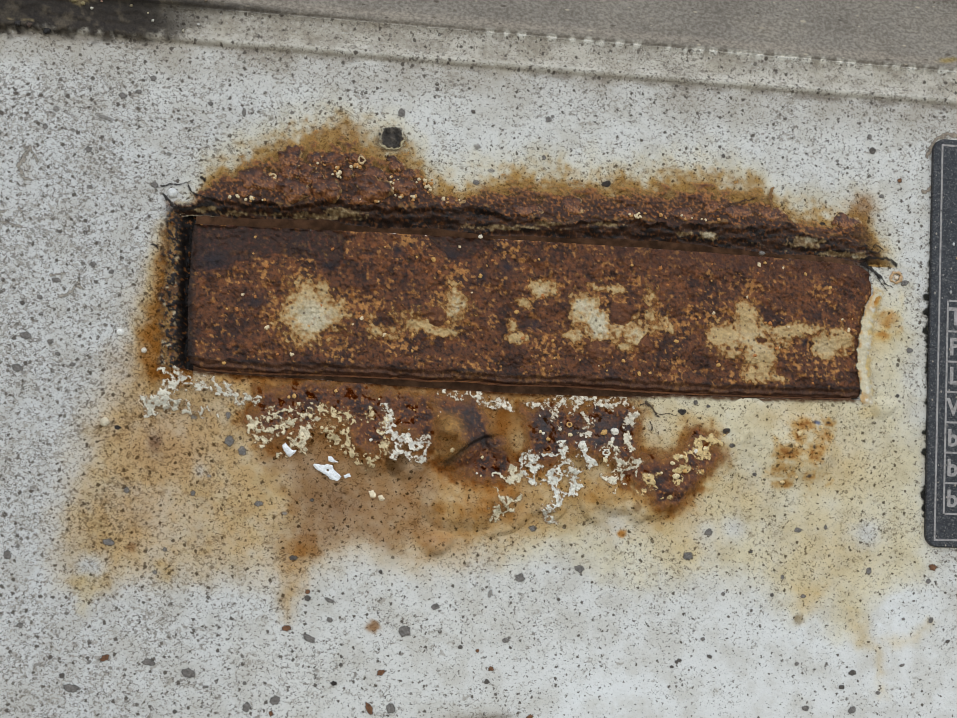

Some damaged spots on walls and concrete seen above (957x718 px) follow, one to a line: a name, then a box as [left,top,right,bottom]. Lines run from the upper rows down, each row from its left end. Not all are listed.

leakage [0,0,257,41]
corrosion [158,129,881,511]